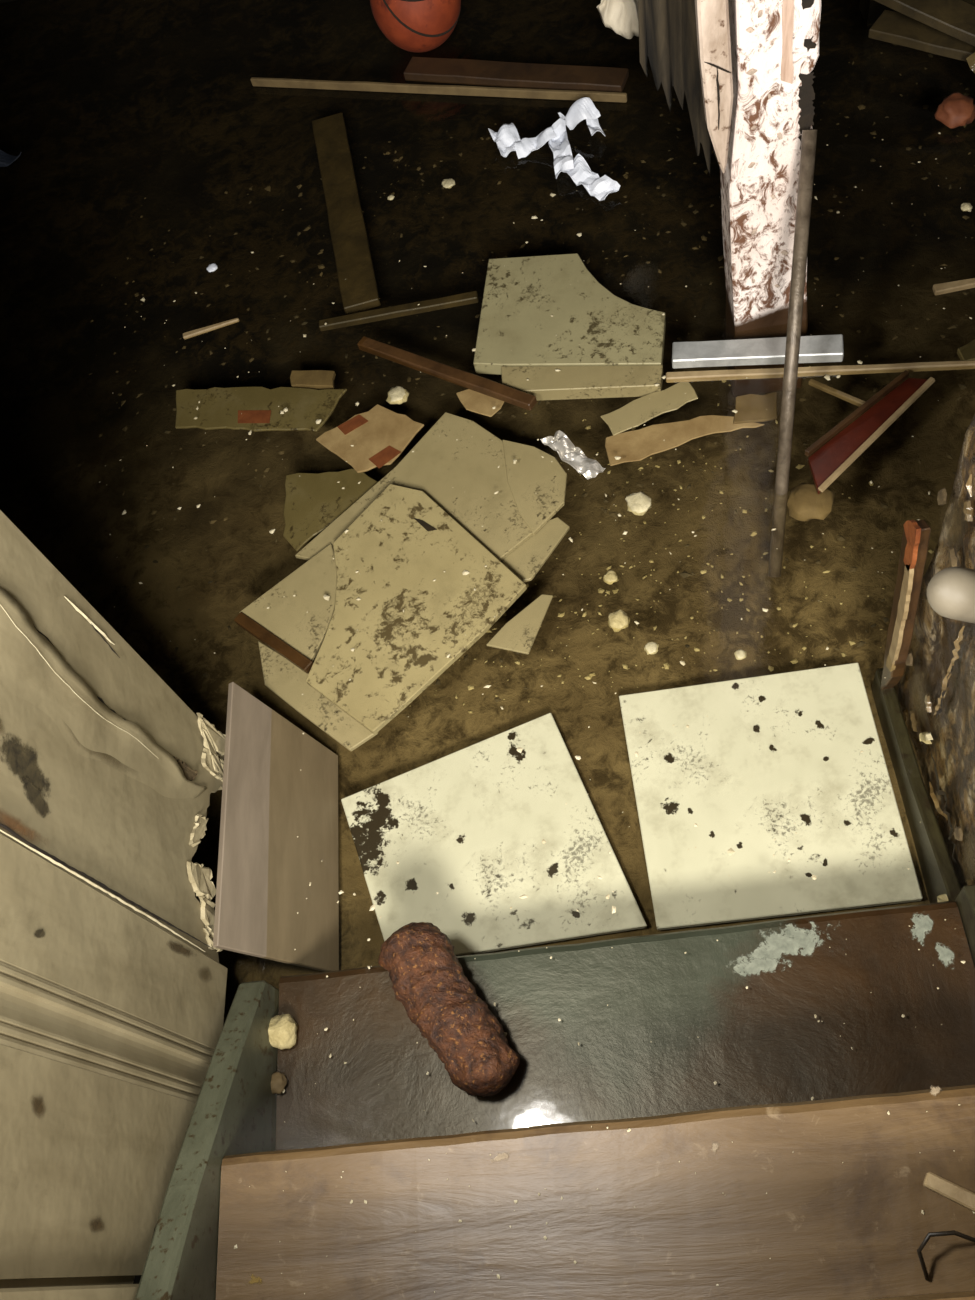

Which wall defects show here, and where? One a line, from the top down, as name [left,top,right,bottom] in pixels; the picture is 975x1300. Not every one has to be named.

crack [64,596,120,658]
water stain [0,722,50,818]
peeling [730,922,831,977]
peeling [911,914,954,969]